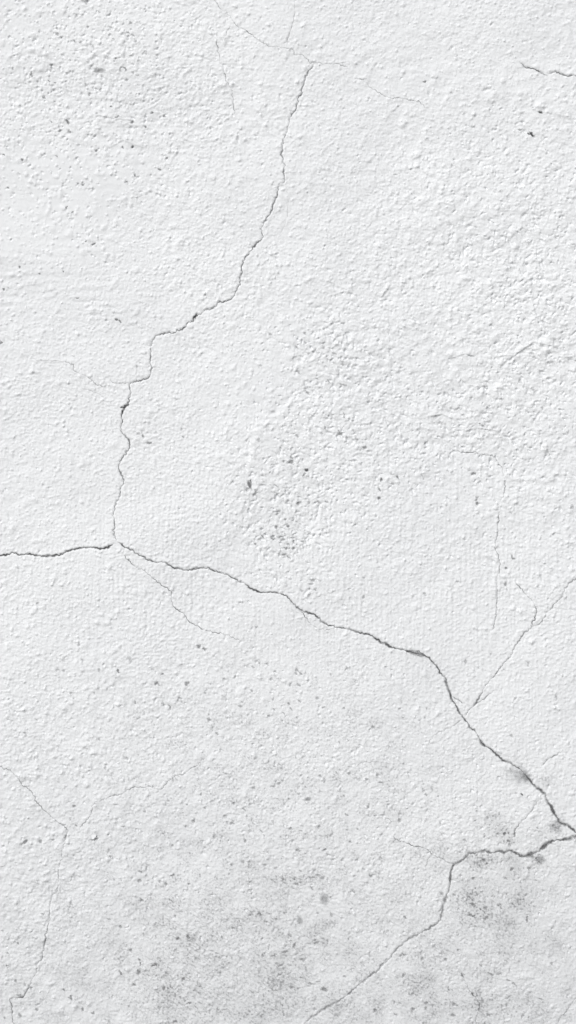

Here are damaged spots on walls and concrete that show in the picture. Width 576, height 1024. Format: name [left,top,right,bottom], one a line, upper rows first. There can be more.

crack [0,46,576,857]